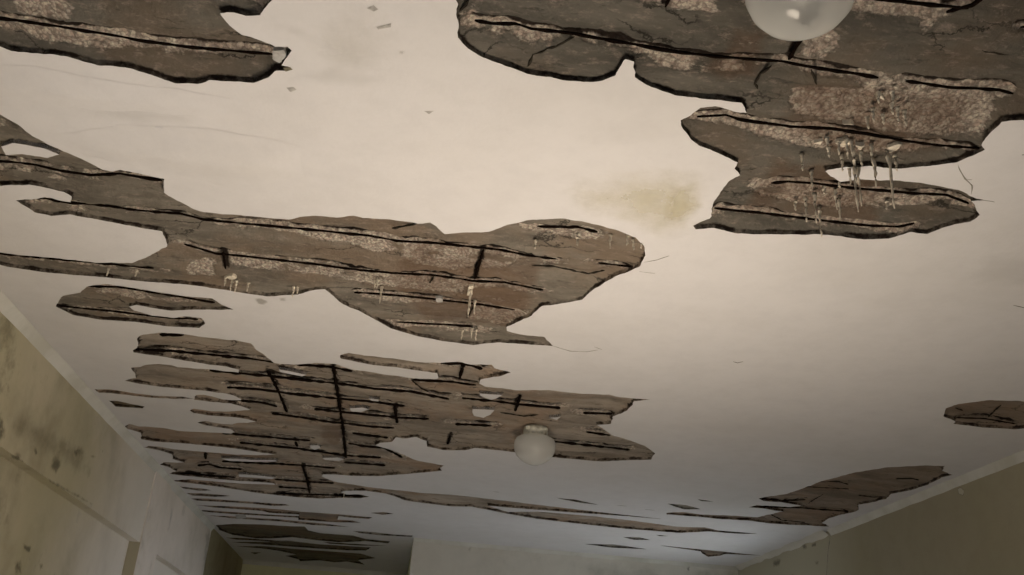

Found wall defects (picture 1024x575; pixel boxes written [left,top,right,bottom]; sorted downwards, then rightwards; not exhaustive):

spalling [0,0,293,84]
spalling [456,0,1024,239]
spalling [0,115,951,565]
spalling [944,400,1024,429]